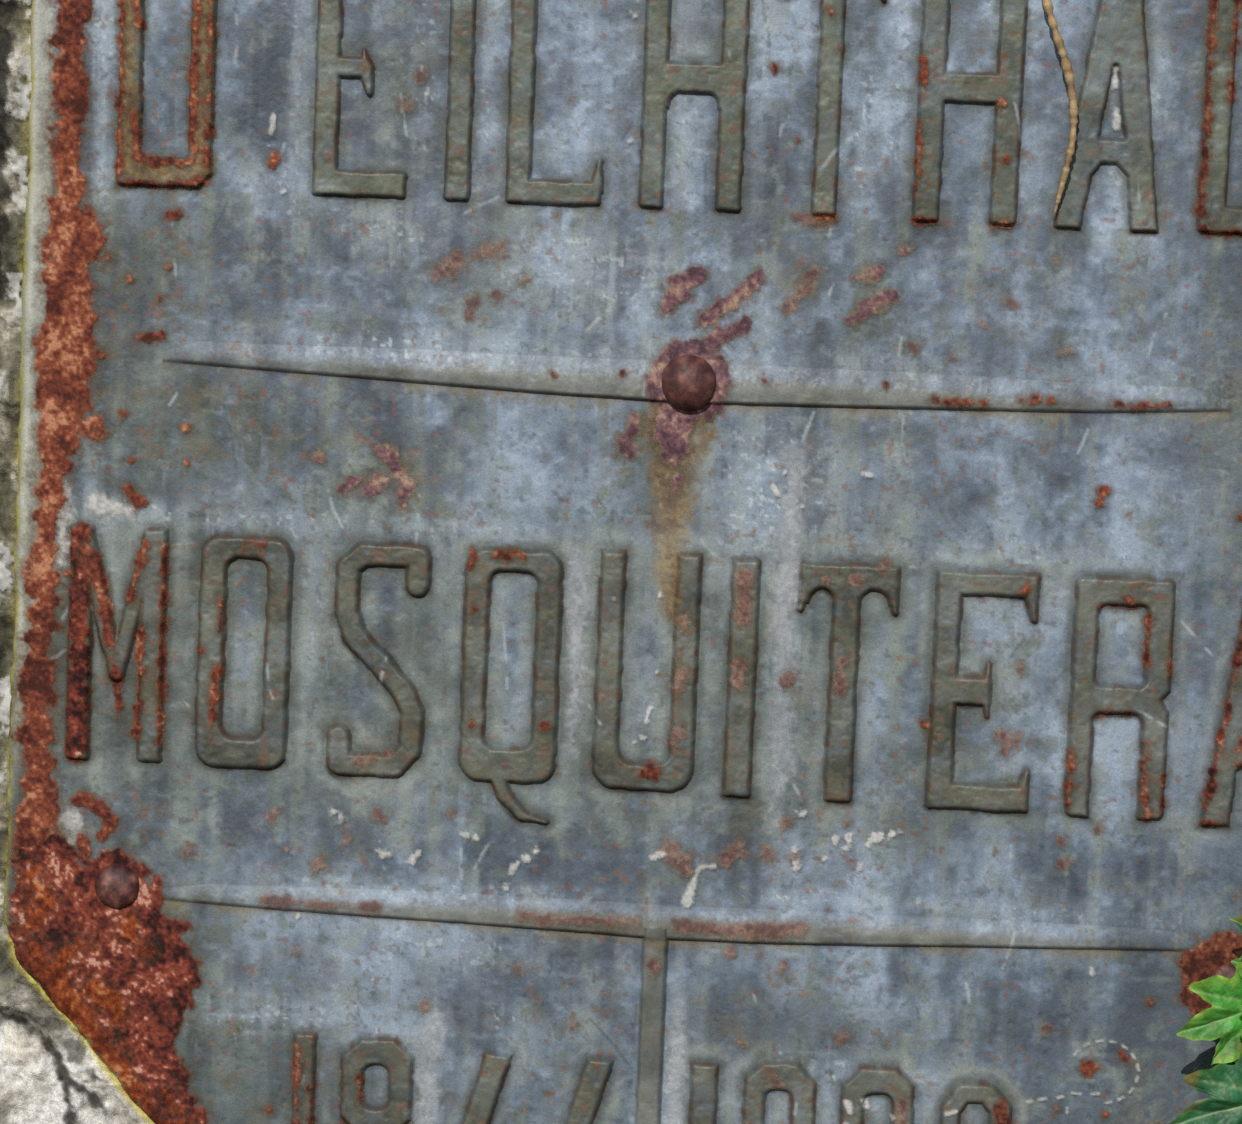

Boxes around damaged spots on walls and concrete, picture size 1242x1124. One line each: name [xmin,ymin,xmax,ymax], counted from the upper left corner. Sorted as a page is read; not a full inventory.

rust [1194,0,1242,238]
rust [613,266,765,492]
rust [1113,399,1173,411]
rust [336,443,416,509]
rust [1095,484,1111,508]
rust [7,0,218,1124]
rust [1231,619,1242,681]
rust [1200,702,1242,827]
rust [260,893,381,913]
rust [671,918,807,958]
rust [1177,930,1242,1018]
rust [1080,1059,1099,1077]